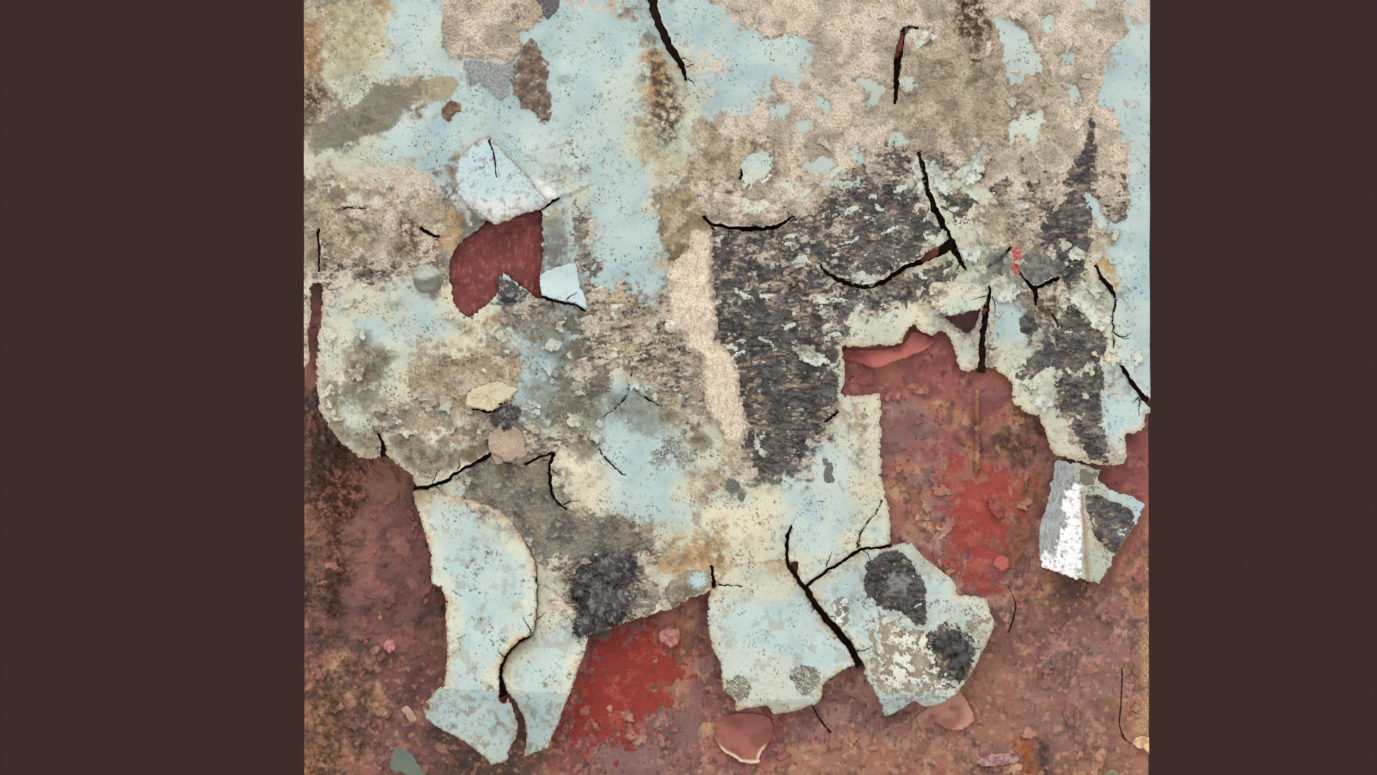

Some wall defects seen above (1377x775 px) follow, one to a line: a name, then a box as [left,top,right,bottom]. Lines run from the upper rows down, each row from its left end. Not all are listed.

crack [648,0,695,86]
crack [893,26,918,104]
spalling [315,137,549,282]
crack [820,152,1059,374]
peeling [724,323,796,361]
rust [311,436,367,616]
rust [308,665,371,775]
peeling [329,490,680,765]
crack [784,500,891,668]
peeling [707,543,995,770]
peeling [988,460,1145,584]
rust [1137,631,1149,737]